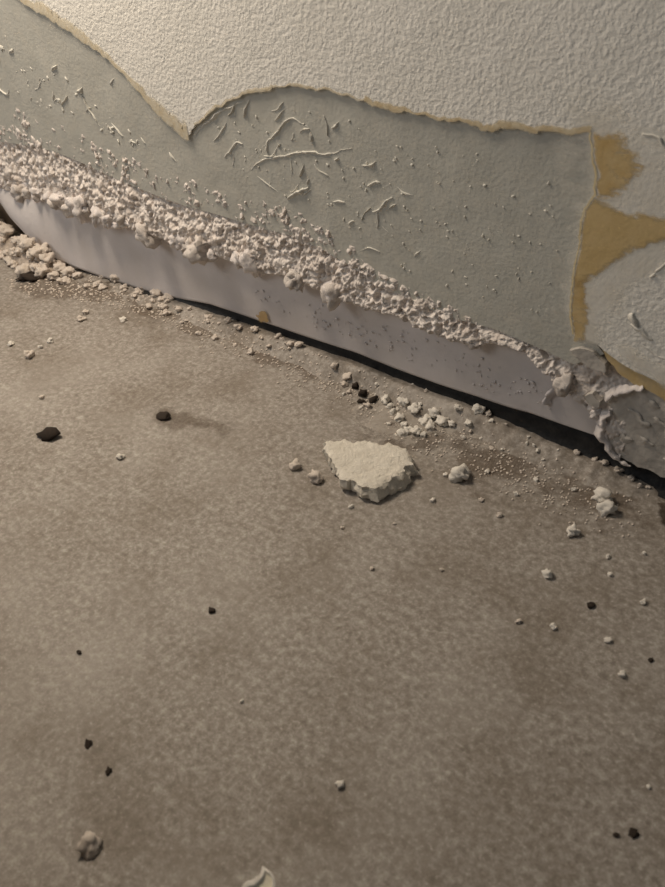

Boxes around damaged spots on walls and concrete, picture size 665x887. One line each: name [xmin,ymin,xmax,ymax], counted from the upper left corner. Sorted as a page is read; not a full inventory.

peeling [0,0,654,458]